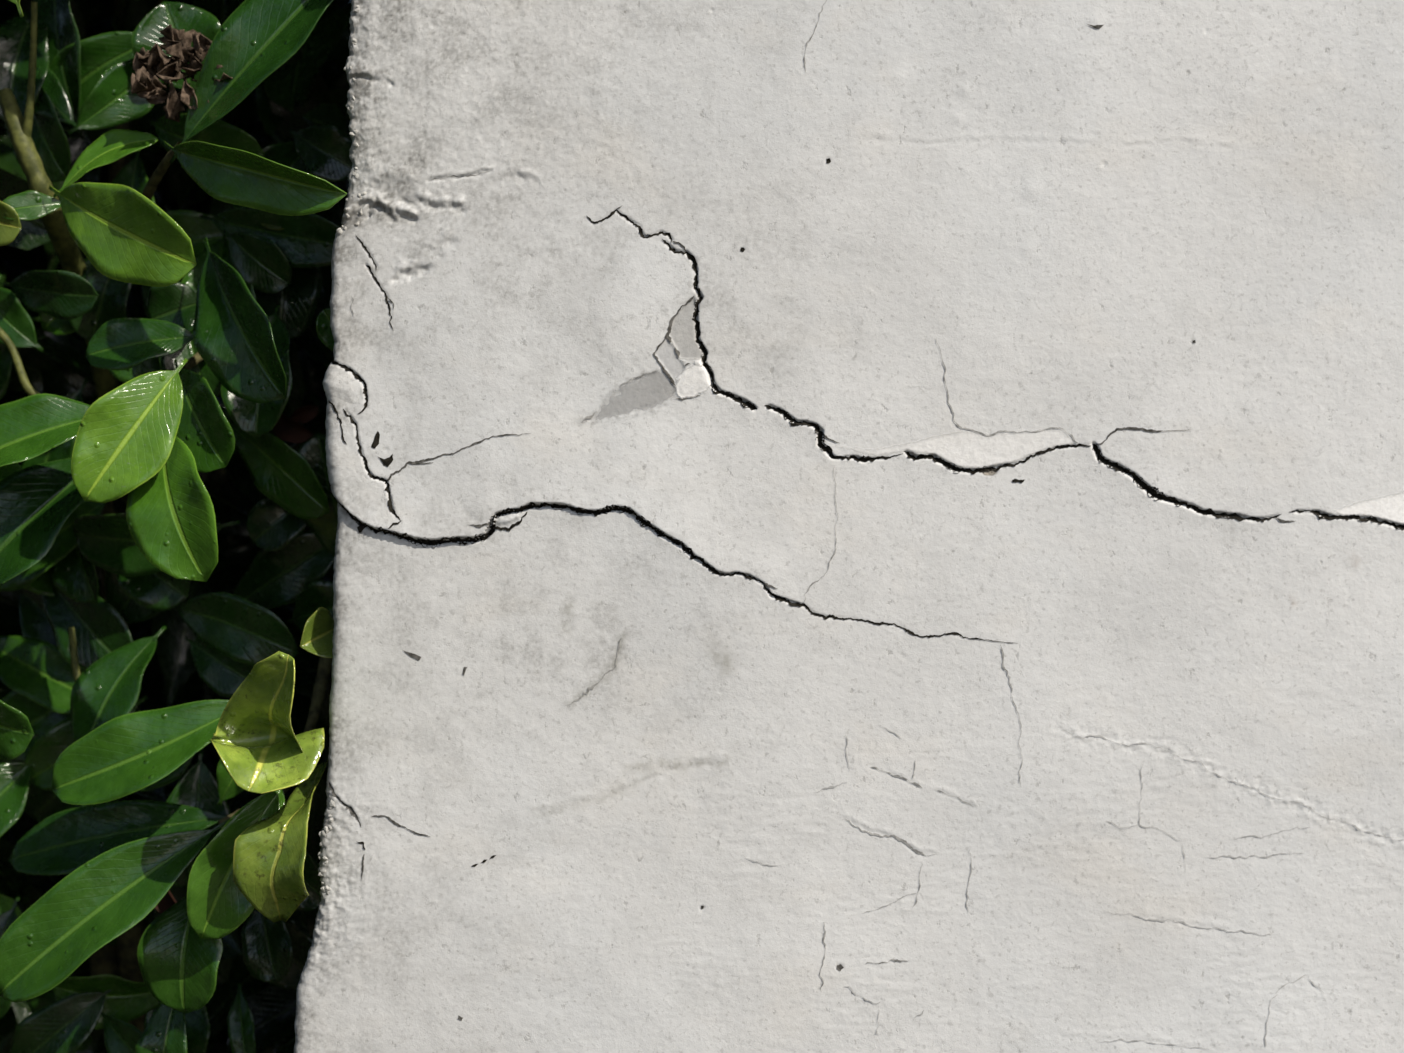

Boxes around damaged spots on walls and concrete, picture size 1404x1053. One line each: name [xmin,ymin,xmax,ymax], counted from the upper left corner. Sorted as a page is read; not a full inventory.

peeling [582,296,712,423]
crack [327,205,1404,784]
spalling [853,430,1074,483]
spalling [1335,492,1404,524]